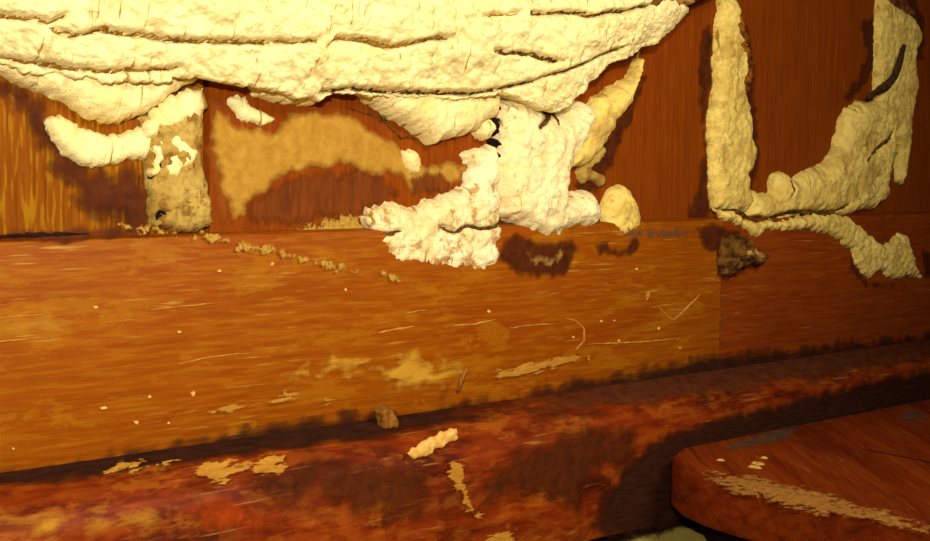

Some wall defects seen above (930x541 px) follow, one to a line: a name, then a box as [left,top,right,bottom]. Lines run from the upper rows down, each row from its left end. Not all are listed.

leakage [0,84,148,244]
leakage [249,167,396,225]
leakage [576,76,646,192]
leakage [699,27,713,144]
leakage [689,156,740,251]
leakage [747,66,759,184]
leakage [845,17,874,101]
leakage [500,234,576,277]
peeling [104,458,179,475]
peeling [195,454,288,484]
peeling [446,461,483,518]
peeling [486,531,515,541]